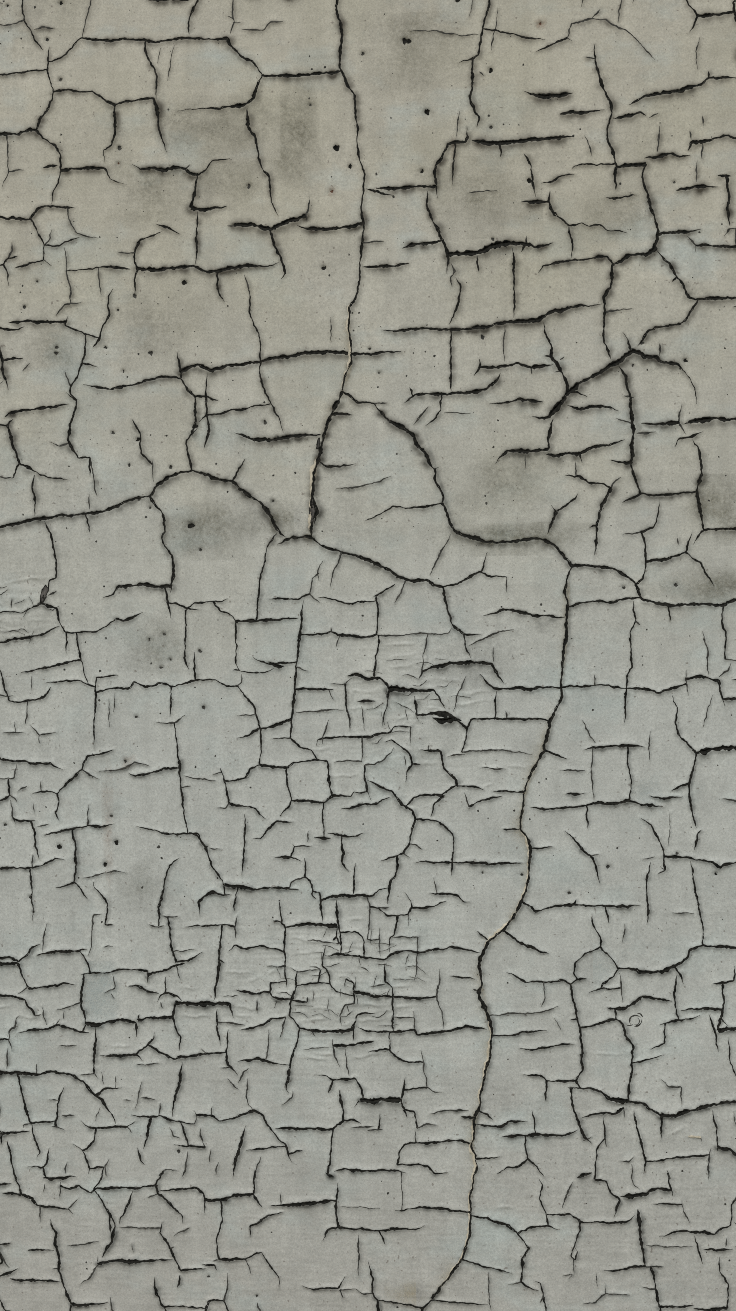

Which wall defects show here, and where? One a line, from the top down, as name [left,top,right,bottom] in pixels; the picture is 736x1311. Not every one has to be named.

crack [413,0,652,125]
crack [118,158,310,301]
crack [363,45,736,555]
crack [0,289,113,495]
crack [531,722,677,827]
crack [672,695,736,826]
crack [497,818,736,1179]
crack [0,1220,114,1311]
crack [0,859,280,1287]
crack [133,1065,382,1177]
crack [249,1183,425,1275]
crack [577,1120,673,1216]